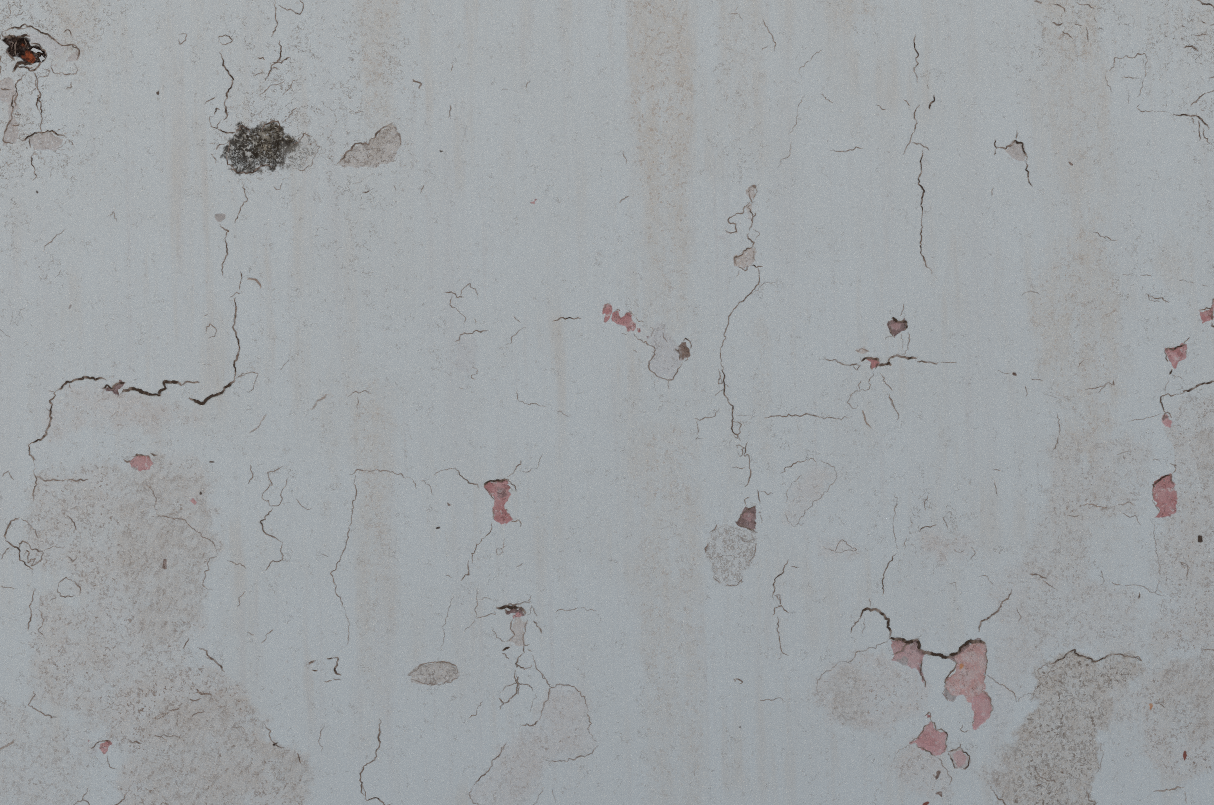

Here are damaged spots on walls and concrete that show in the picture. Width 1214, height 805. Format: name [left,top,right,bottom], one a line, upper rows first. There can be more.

rust [18,39,39,67]
water stain [210,0,432,190]
peeling [335,120,405,172]
crack [878,35,935,271]
peeling [599,300,693,388]
crack [2,185,309,633]
crack [696,269,955,519]
flaking render [481,476,522,529]
flaking render [731,502,760,534]
flaking render [1077,470,1181,522]
crack [979,590,1021,631]
flaking render [818,634,996,801]